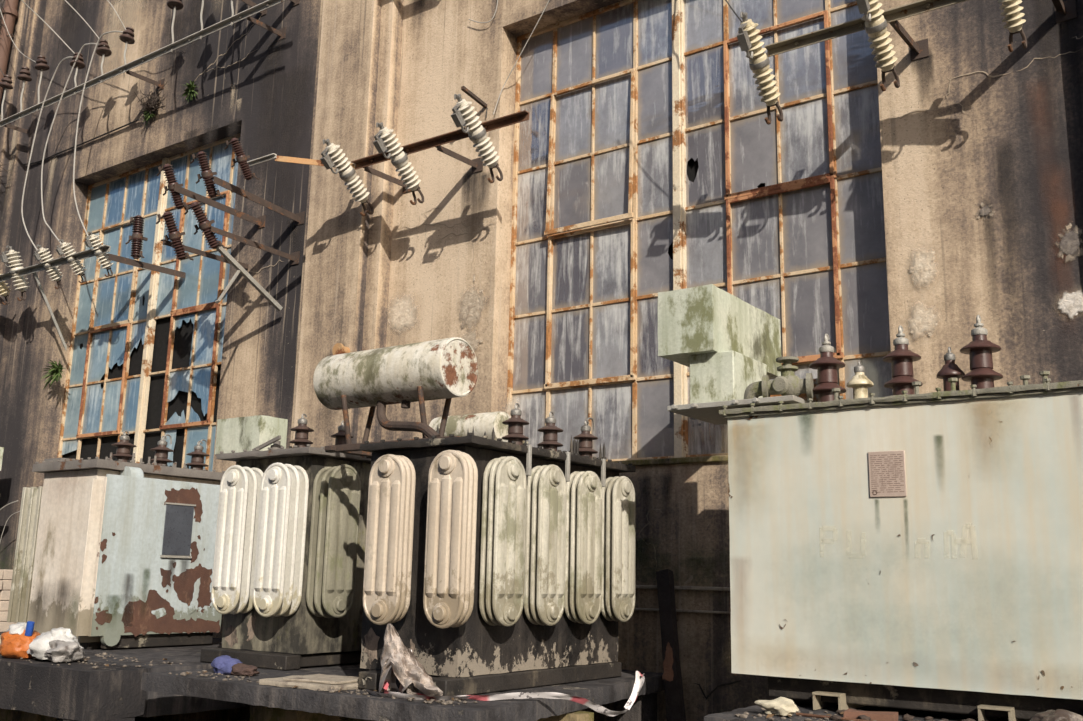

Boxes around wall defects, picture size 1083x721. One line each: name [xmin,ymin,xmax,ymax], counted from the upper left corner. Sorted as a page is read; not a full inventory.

crack [884,36,1083,120]
crack [396,207,495,265]
spalling [1056,224,1083,262]